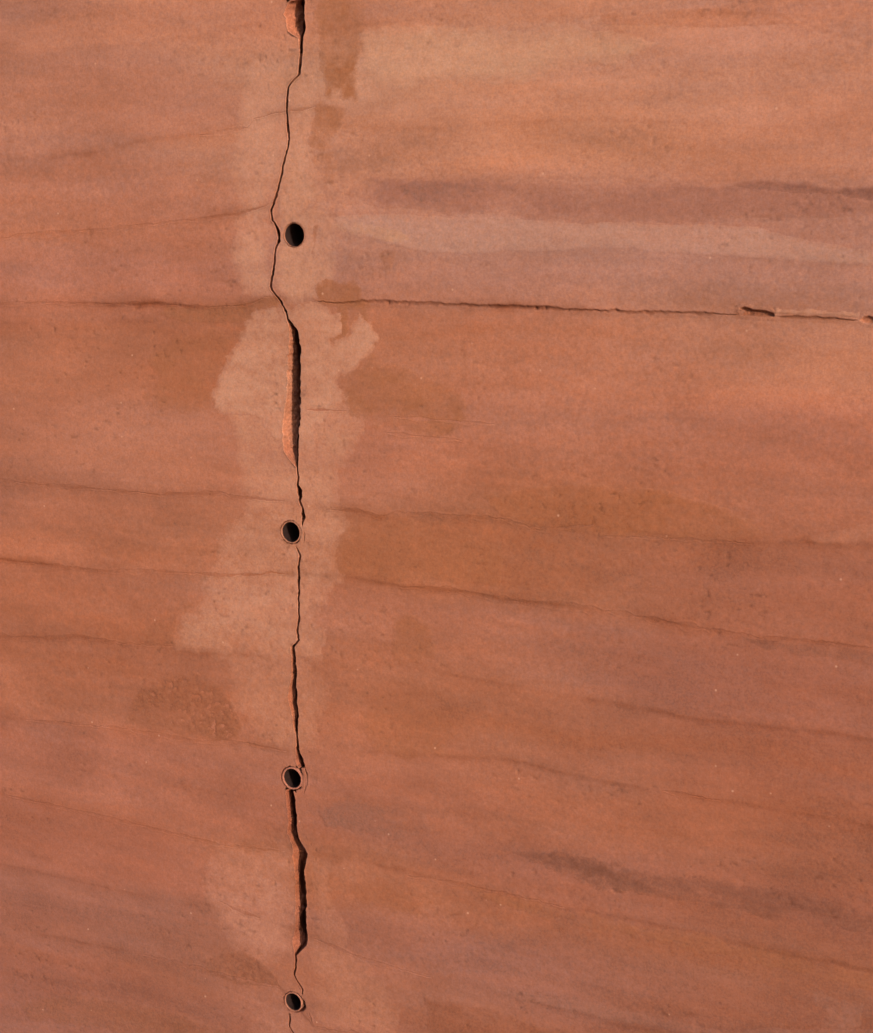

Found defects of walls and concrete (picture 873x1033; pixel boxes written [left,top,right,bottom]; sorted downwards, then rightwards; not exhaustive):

damp [142,278,469,452]
crack [316,296,745,319]
crack [775,313,858,324]
crack [0,0,366,1033]
damp [228,415,505,754]